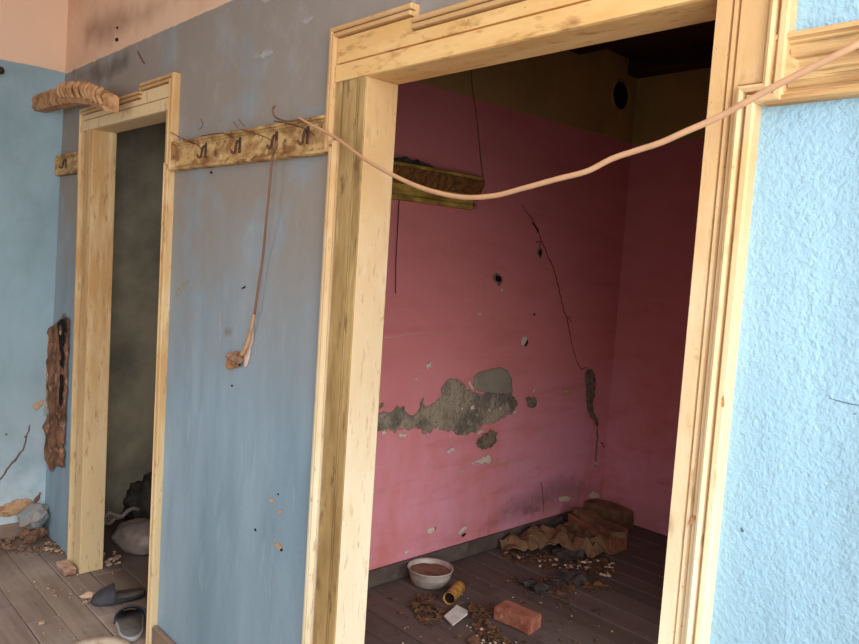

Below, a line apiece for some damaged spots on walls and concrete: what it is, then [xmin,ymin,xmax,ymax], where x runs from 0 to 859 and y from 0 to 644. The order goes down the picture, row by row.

flaking render [33,314,70,471]
flaking render [377,367,537,450]
crack [0,425,30,480]
flaking render [0,492,41,517]